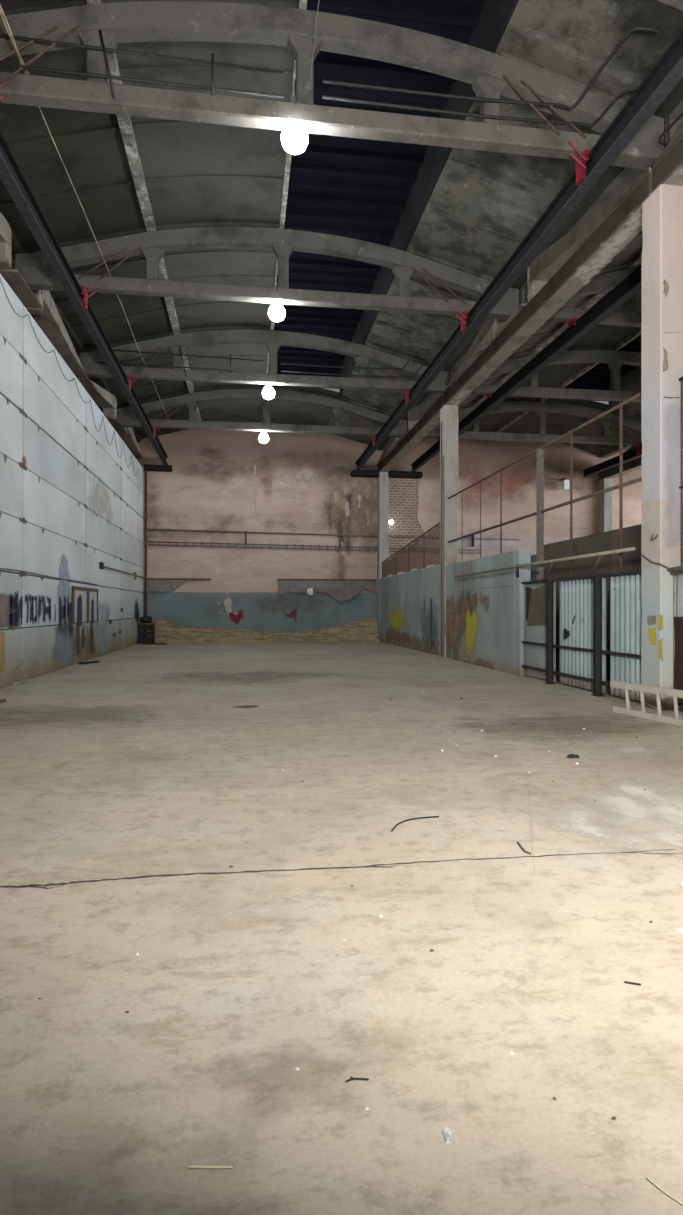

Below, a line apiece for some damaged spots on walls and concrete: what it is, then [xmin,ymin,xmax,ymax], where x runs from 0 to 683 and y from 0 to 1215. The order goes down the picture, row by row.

rust [386,591,492,669]
crack [0,785,675,889]